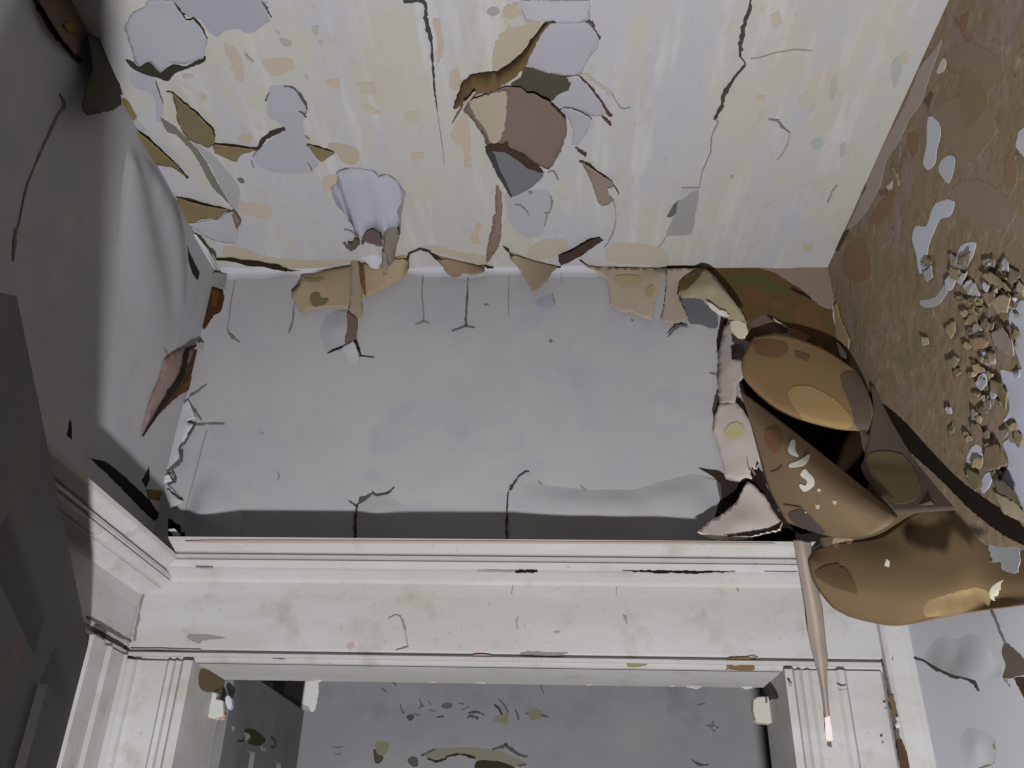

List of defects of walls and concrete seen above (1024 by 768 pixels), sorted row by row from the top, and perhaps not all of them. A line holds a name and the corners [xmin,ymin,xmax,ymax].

crack [12,93,67,261]
peeling [122,0,334,330]
crack [403,0,464,165]
crack [682,0,812,189]
flaking render [835,39,942,252]
peeling [141,344,198,470]
crack [142,344,225,512]
crack [349,487,395,538]
crack [505,471,542,539]
peeling [291,0,869,717]
flaking render [867,251,1024,545]